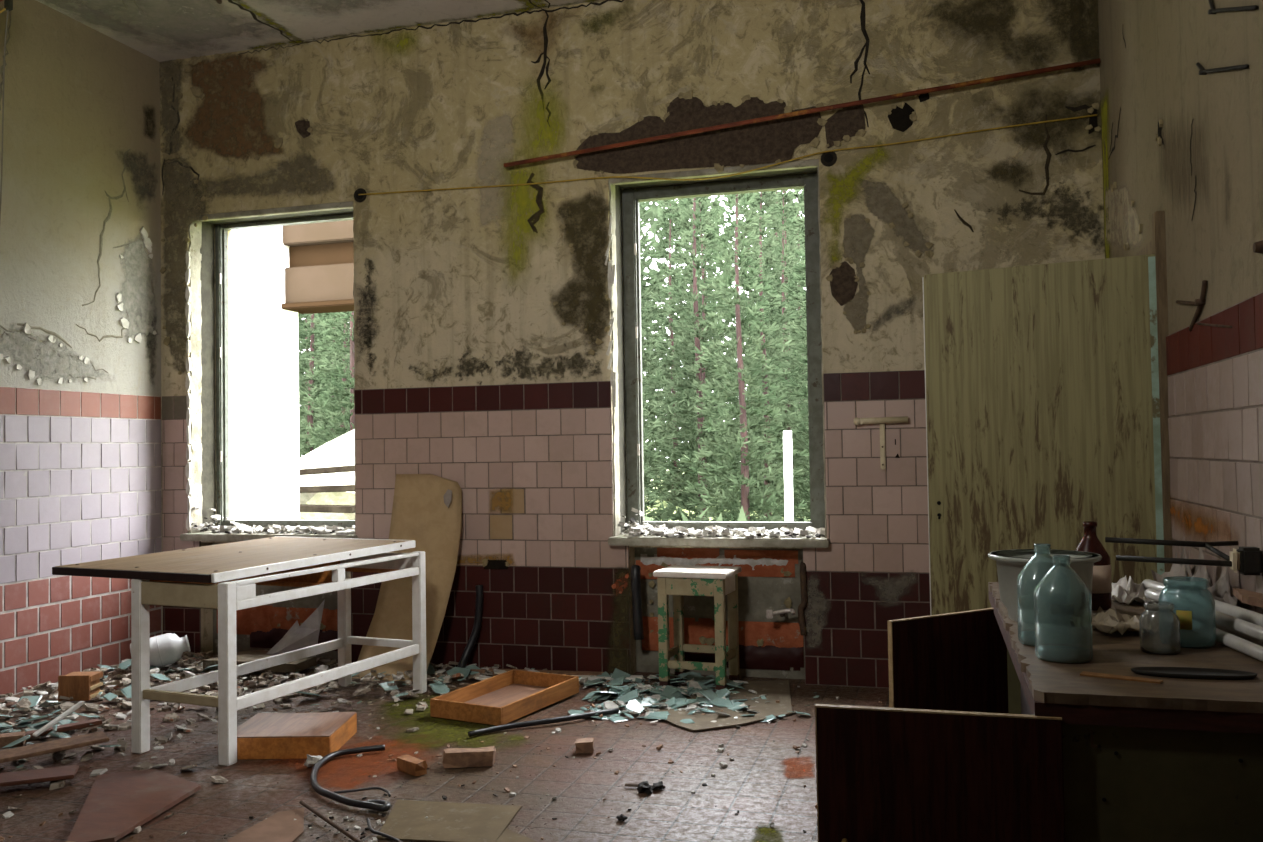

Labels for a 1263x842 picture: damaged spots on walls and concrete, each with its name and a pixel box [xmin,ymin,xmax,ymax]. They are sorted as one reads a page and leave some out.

damp [48,0,276,48]
crack [228,0,624,128]
crack [850,0,870,127]
spalling [295,117,313,138]
spalling [573,90,866,174]
damp [994,92,1102,155]
mould [989,162,1027,185]
mould [988,188,1105,249]
peeling [116,54,283,530]
peeling [0,323,108,386]
mould [146,320,156,383]
mould [409,344,601,382]